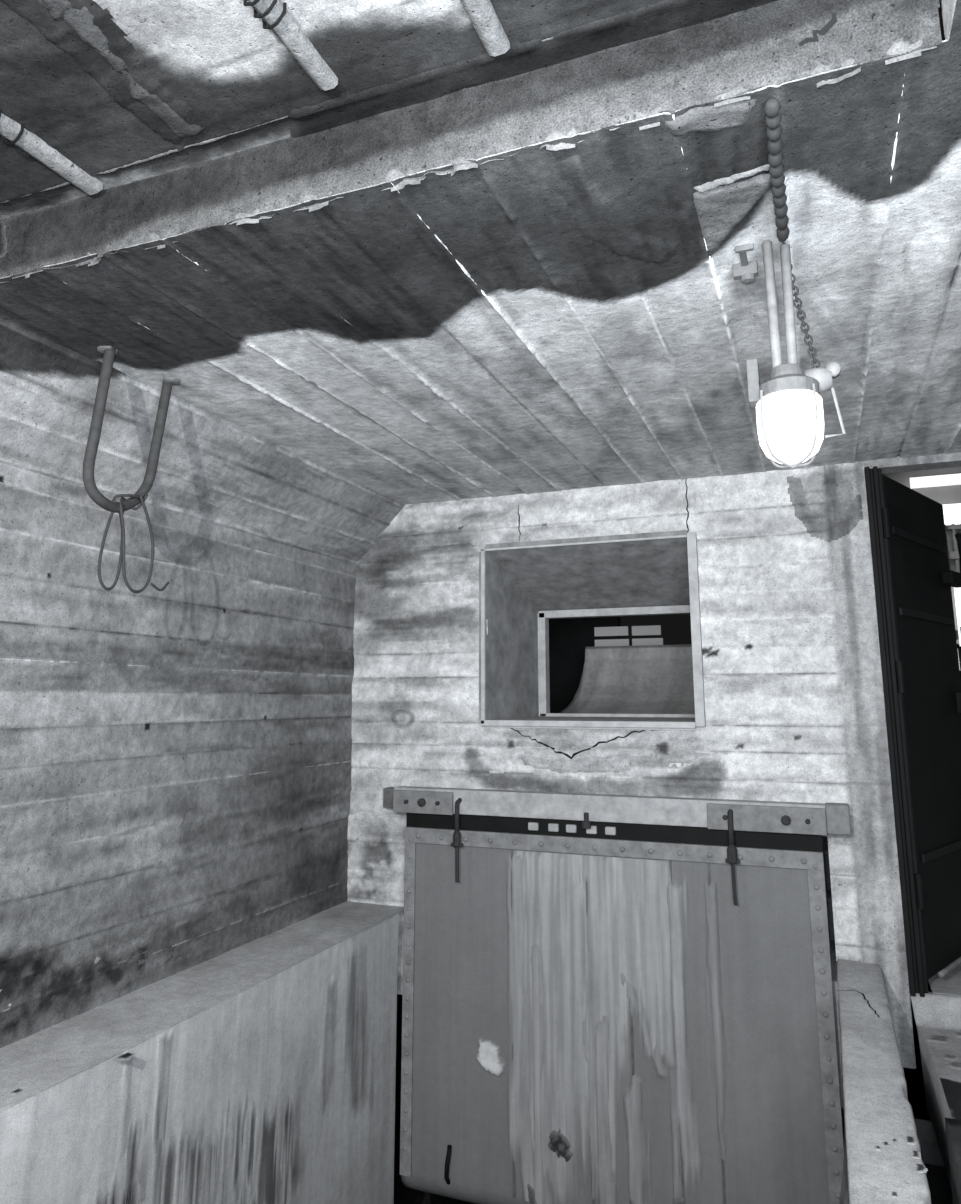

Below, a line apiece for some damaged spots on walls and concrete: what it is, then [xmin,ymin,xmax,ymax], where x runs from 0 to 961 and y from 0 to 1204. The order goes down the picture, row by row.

damp [0,732,352,1048]
damp [83,1090,306,1204]